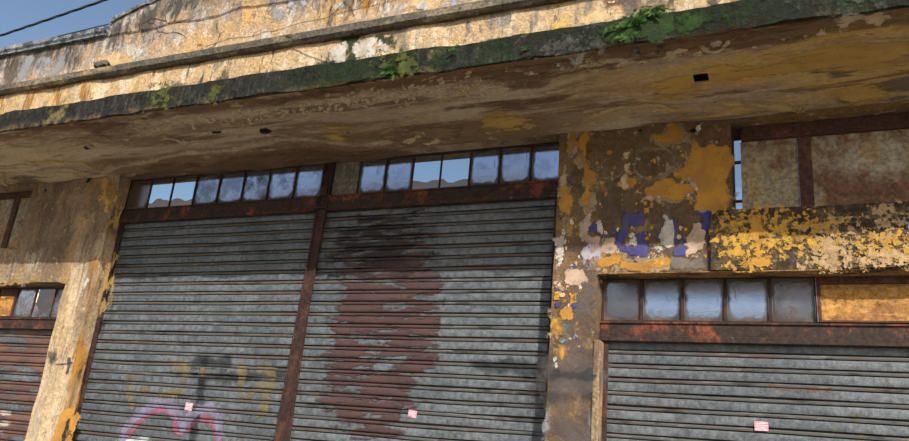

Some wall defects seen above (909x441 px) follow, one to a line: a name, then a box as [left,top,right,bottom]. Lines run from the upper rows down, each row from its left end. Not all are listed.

leakage [1,55,22,85]
leakage [314,34,397,65]
peeling [558,40,731,82]
leakage [258,84,354,108]
peeling [135,68,540,137]
peeling [547,122,909,368]